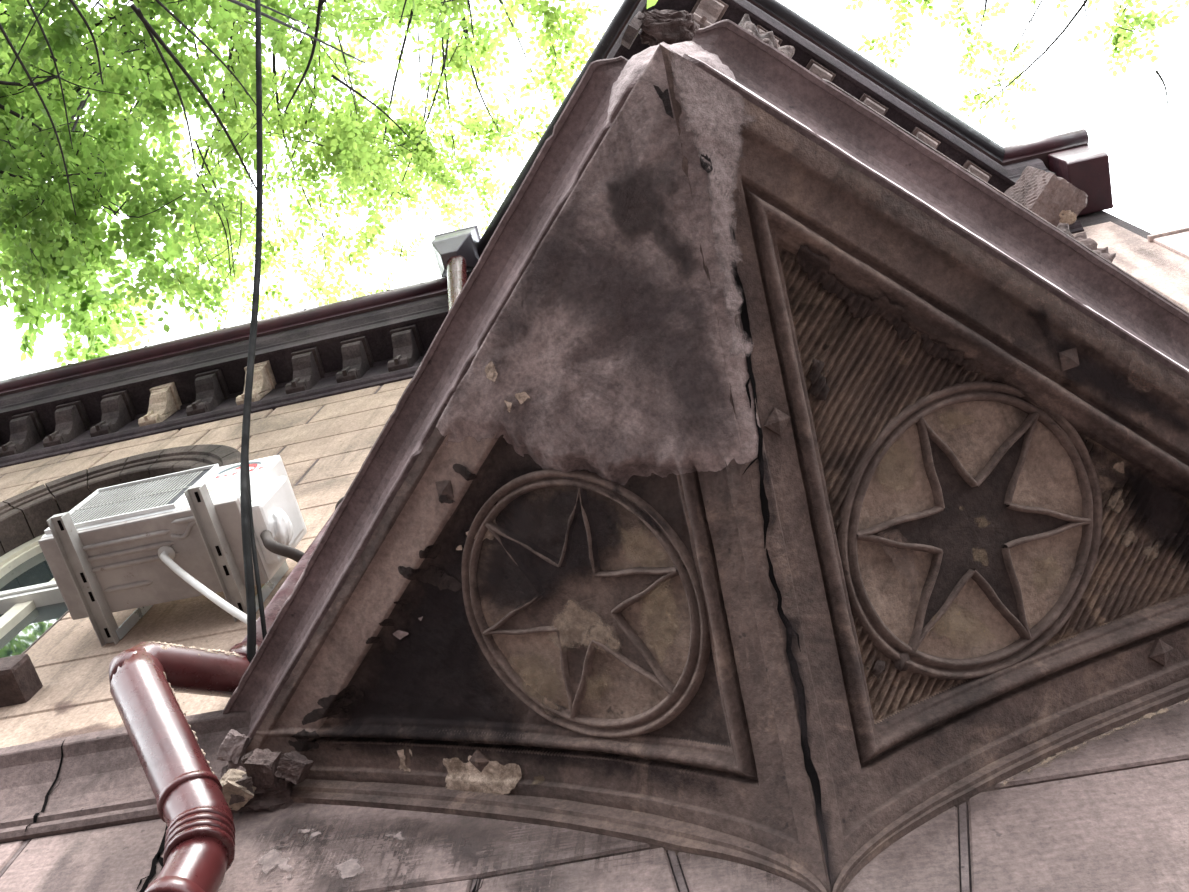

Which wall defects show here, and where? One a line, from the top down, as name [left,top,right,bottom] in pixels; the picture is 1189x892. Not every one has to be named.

leakage [526,212,573,304]
leakage [610,169,694,275]
spalling [606,9,755,355]
spalling [1004,166,1088,227]
leakage [565,254,708,426]
peeling [398,544,462,592]
crack [730,224,822,822]
peeling [366,600,408,644]
crack [25,740,65,832]
spalling [217,685,364,814]
spalling [443,756,543,795]
crack [136,824,168,892]